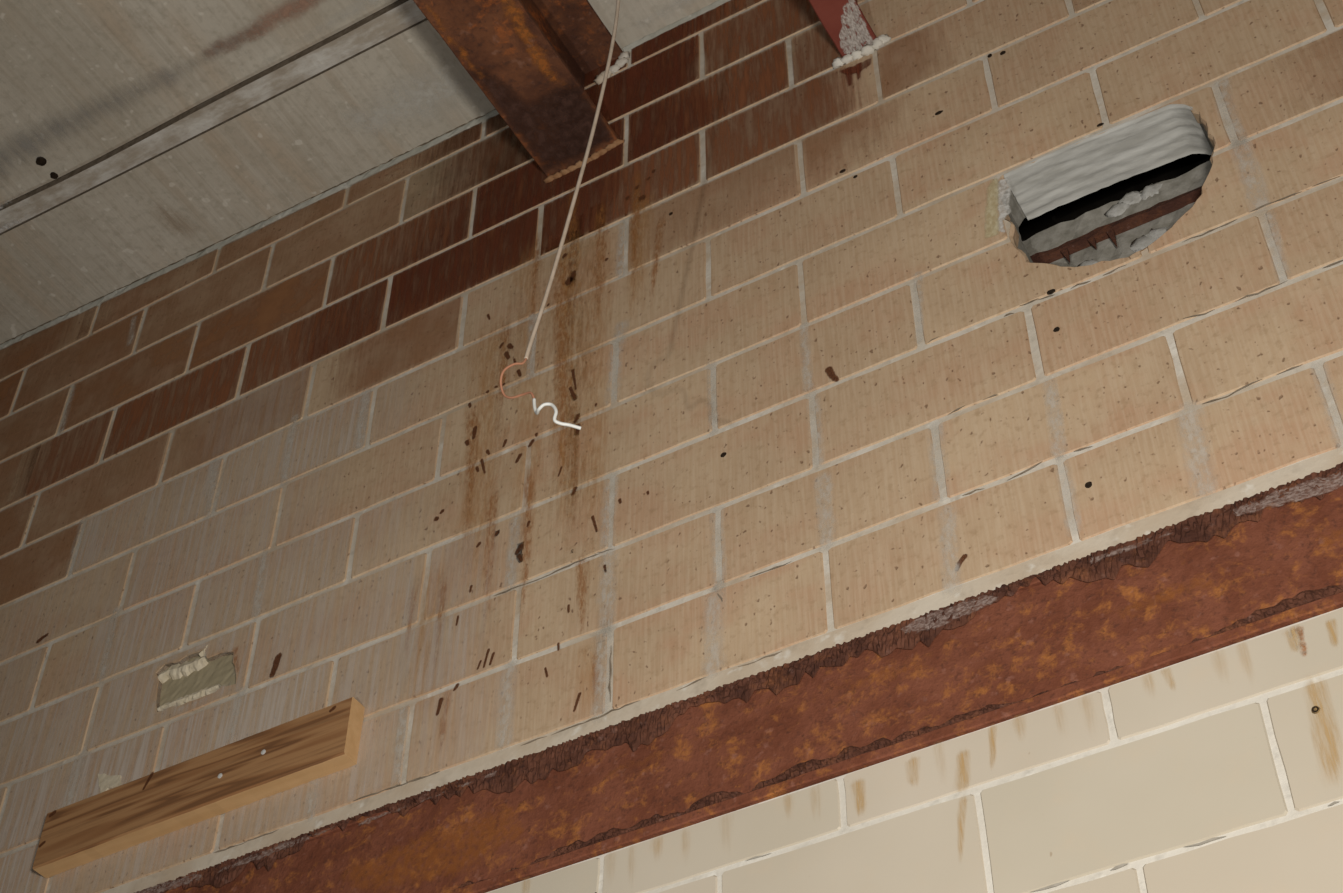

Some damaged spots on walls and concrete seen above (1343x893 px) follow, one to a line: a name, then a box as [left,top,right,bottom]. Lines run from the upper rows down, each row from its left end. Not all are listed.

hole [985,104,1216,267]
rust [0,0,871,495]
rust [0,506,32,604]
rust [515,479,532,577]
spalling [157,645,237,711]
rust [436,683,459,733]